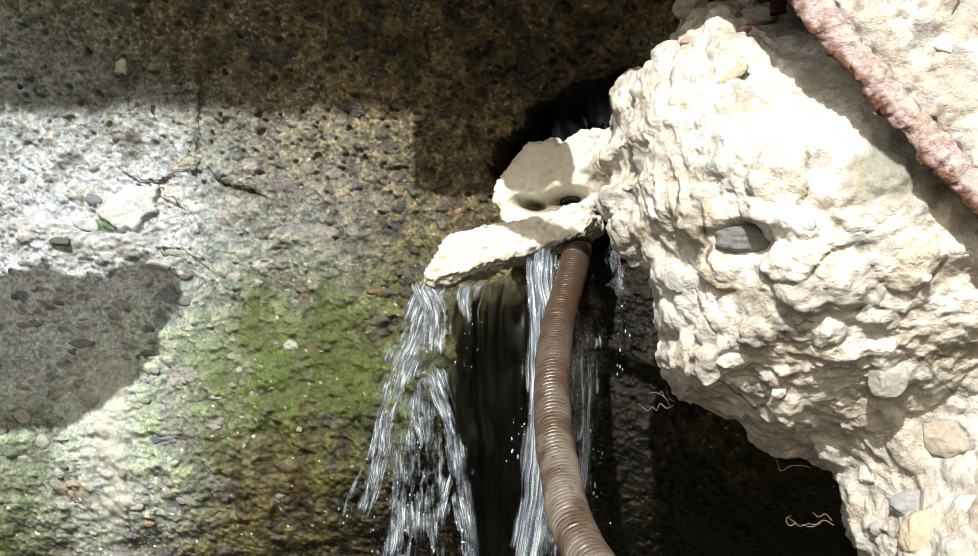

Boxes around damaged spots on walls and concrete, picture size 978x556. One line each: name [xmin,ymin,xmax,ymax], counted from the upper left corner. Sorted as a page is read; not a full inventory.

crack [139,74,259,208]
efflorescence [97,390,130,519]